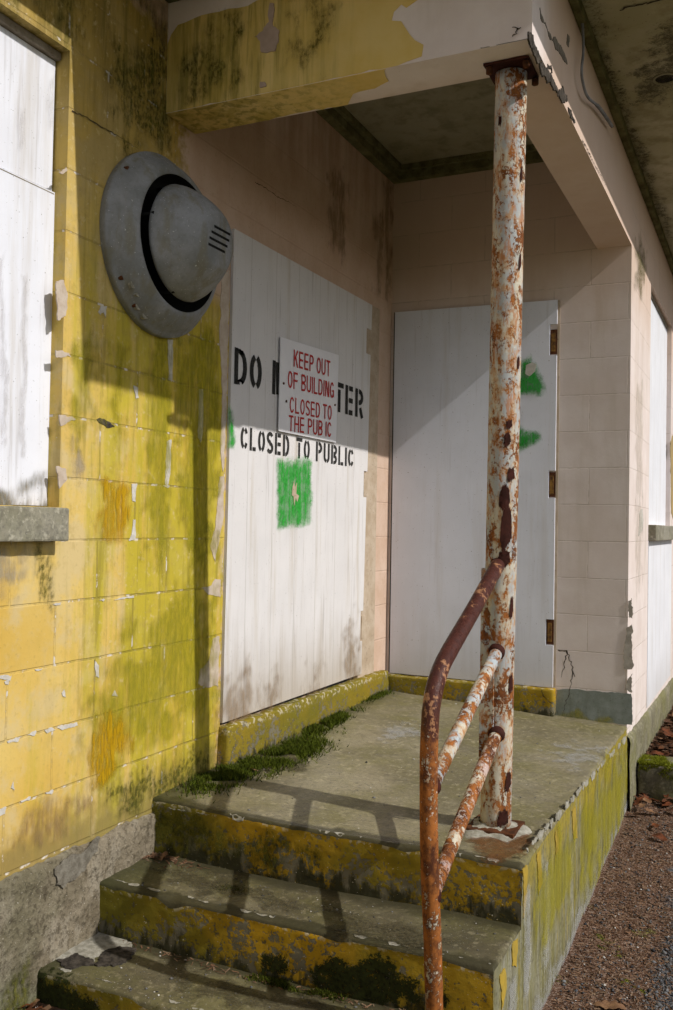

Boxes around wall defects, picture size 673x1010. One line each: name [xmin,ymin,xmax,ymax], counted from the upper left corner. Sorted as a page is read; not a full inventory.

peeling [166,0,423,134]
spalling [484,31,576,123]
peeling [540,9,570,64]
crack [620,0,660,11]
leakage [149,332,221,558]
rust [504,419,512,449]
rust [498,466,515,568]
leakage [91,593,212,737]
rust [468,834,532,865]
rust [497,809,508,827]
peeling [499,938,518,1010]